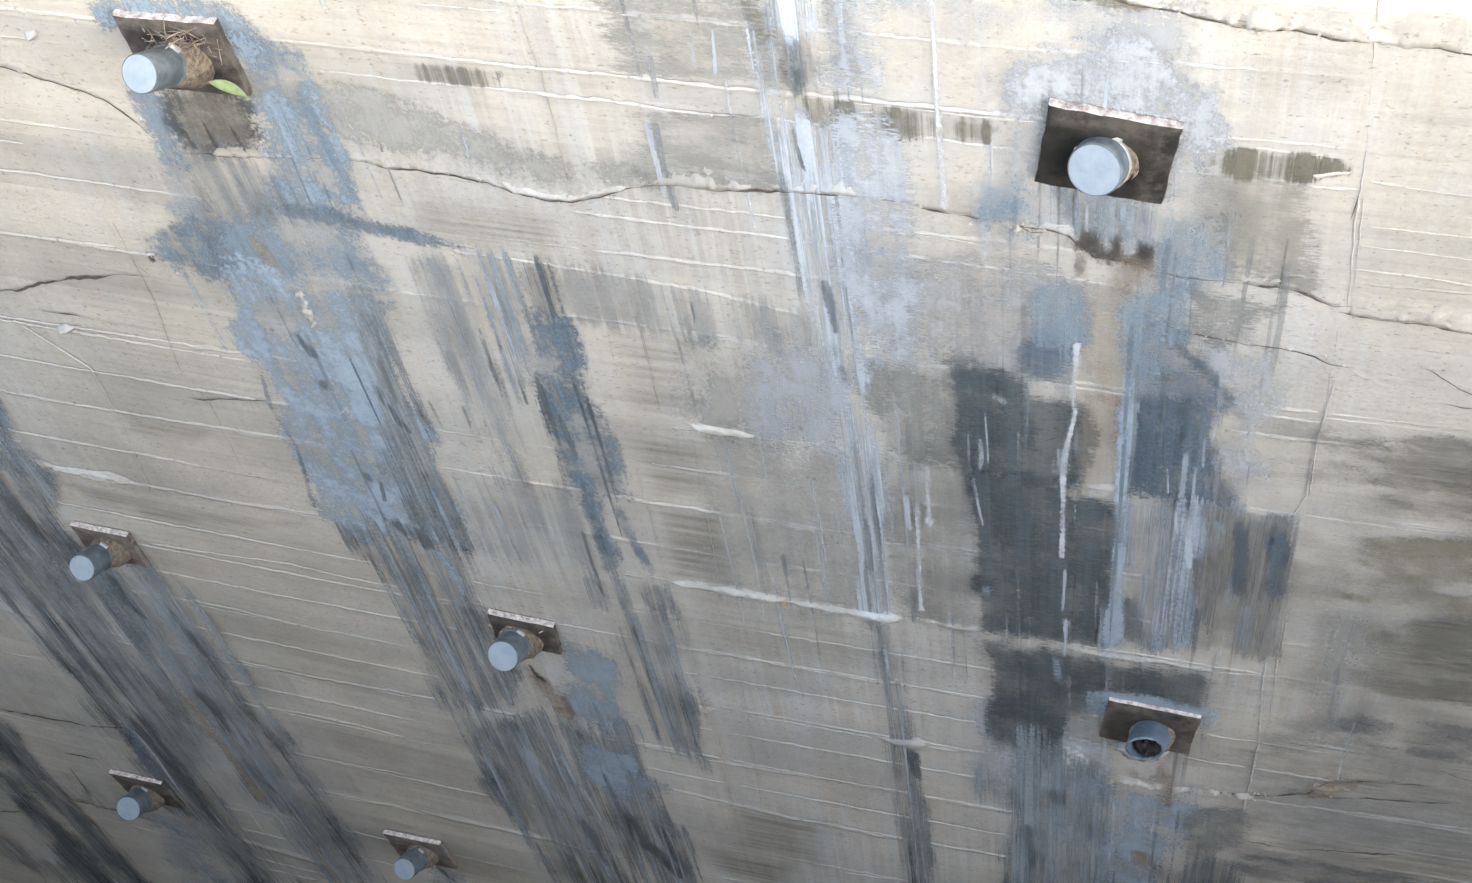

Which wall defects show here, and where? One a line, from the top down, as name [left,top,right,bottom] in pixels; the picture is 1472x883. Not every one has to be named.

crack [1113,0,1472,56]
crack [0,58,156,140]
crack [191,141,1472,334]
crack [2,264,144,317]
crack [1155,314,1351,368]
crack [184,394,264,402]
crack [1423,368,1472,409]
leakage [87,0,710,883]
leakage [583,0,1298,883]
leakage [0,406,372,883]